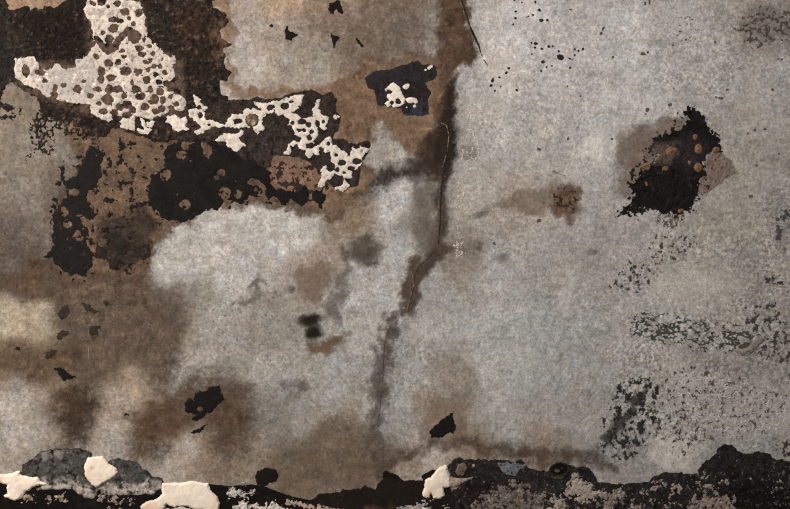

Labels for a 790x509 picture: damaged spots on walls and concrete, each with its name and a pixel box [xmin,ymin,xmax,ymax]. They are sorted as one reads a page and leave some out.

crack [460,0,488,66]
peeling [14,0,369,283]
damp [213,155,375,222]
crack [406,91,452,311]
corrosion [498,184,582,223]
corrosion [642,146,677,171]
corrosion [688,134,703,172]
damp [0,121,257,461]
crack [377,325,390,427]
damp [600,362,790,474]
peeling [0,448,334,509]
spalling [397,462,475,509]